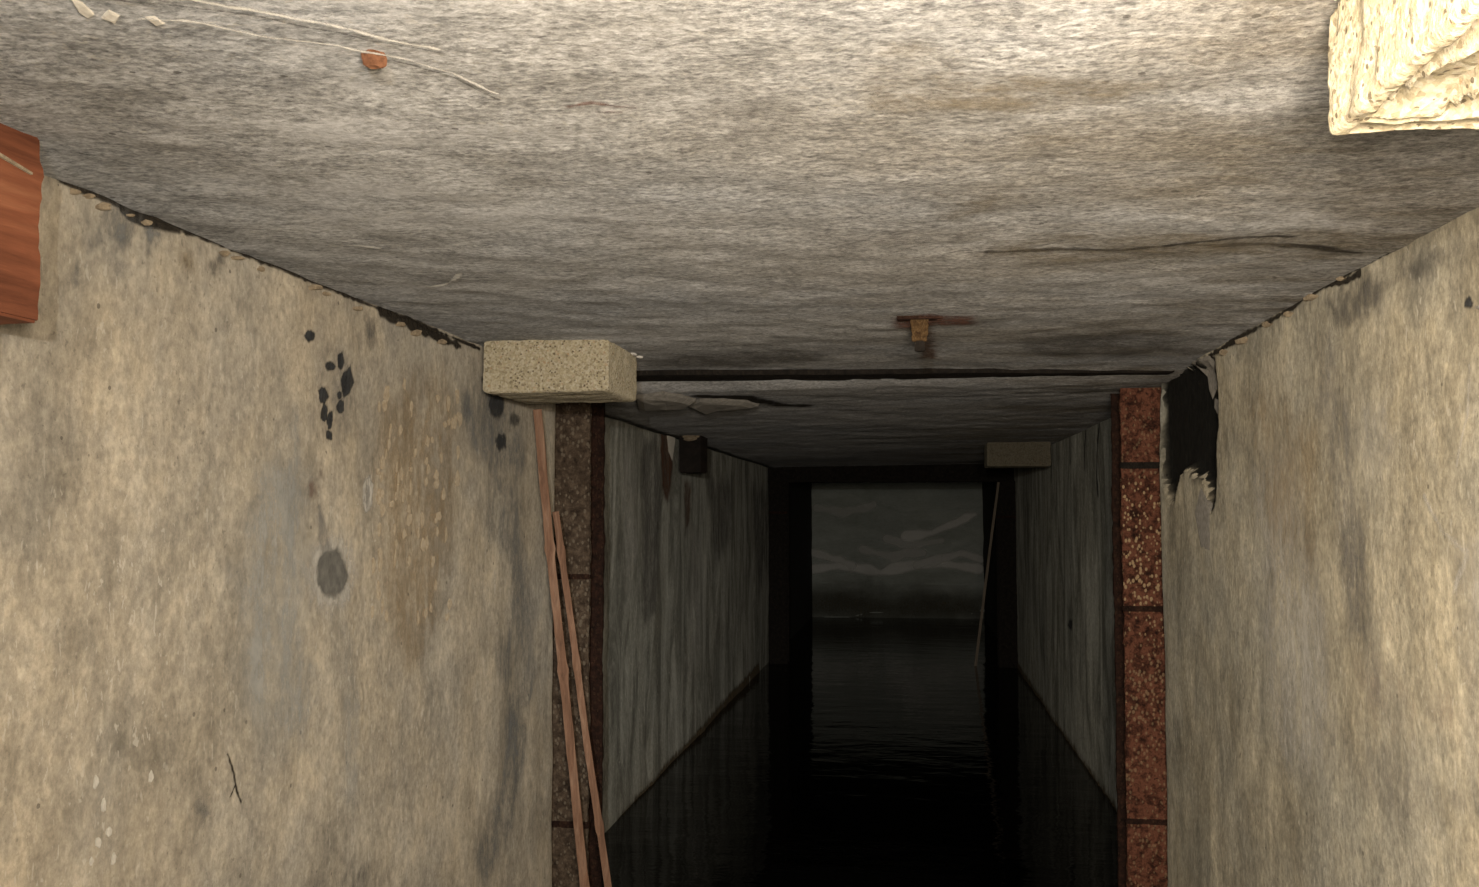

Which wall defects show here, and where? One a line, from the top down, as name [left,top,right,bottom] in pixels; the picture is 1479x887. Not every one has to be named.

rust [895,314,974,358]
water stain [318,353,354,440]
spalling [1163,356,1219,550]
water stain [309,540,351,604]